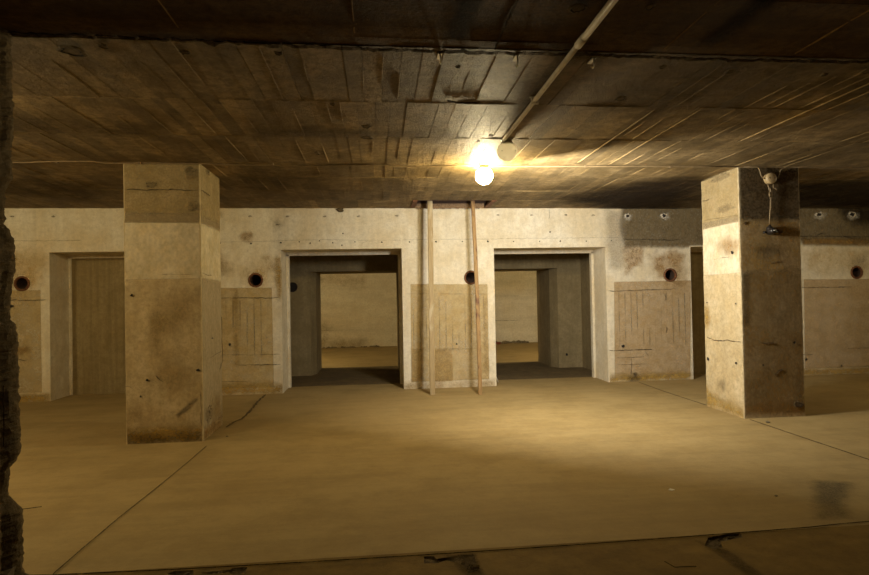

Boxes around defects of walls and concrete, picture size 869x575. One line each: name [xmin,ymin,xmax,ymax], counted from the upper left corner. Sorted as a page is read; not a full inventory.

spalling [0,28,42,575]